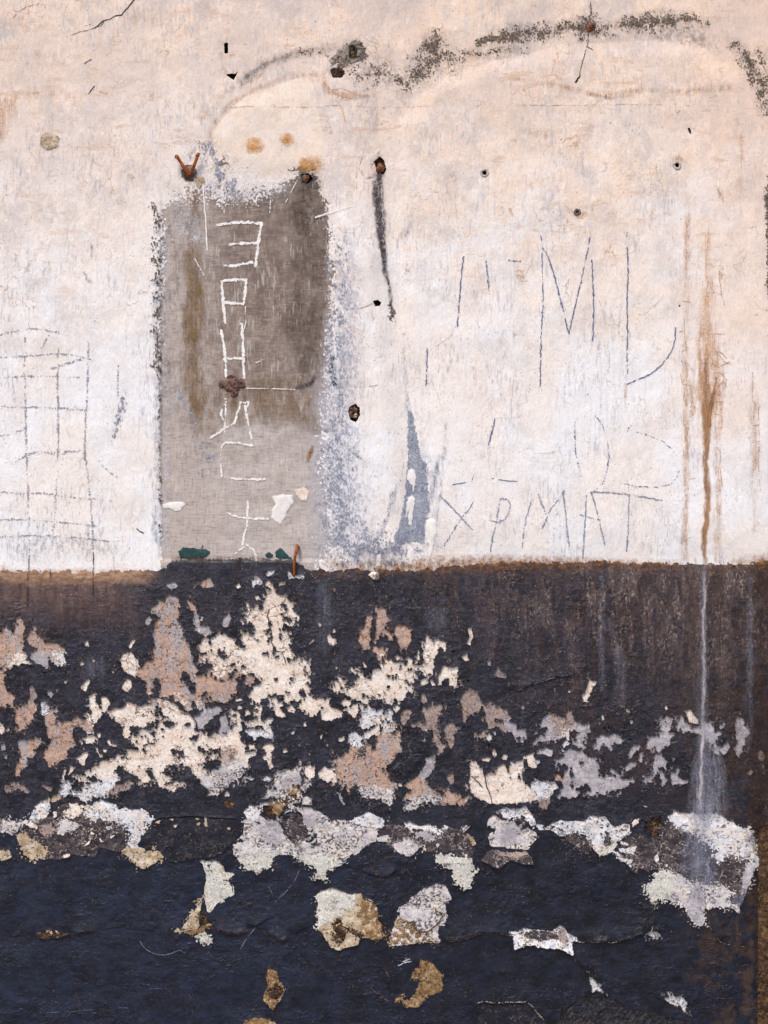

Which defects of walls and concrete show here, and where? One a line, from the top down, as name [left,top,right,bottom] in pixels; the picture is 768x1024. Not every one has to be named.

corrosion [682,282,720,563]
peeling [0,570,768,1024]
water stain [683,569,721,868]